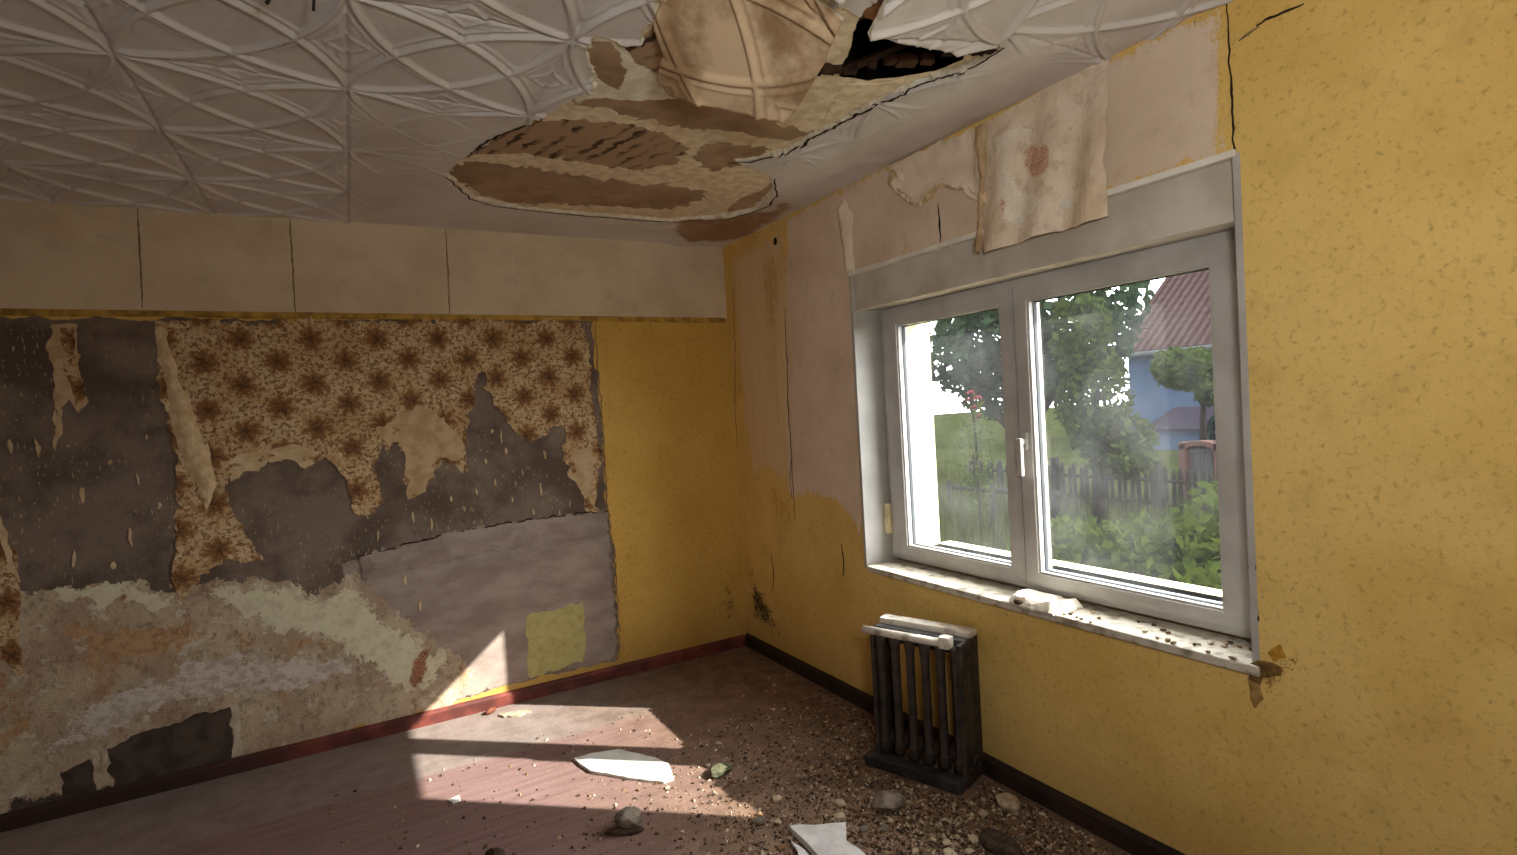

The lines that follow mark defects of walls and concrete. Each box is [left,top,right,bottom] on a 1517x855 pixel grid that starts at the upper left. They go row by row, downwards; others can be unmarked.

spalling [444,0,1005,222]
crack [1226,3,1304,149]
peeling [730,9,1227,541]
peeling [0,316,621,814]
spalling [1248,644,1298,709]